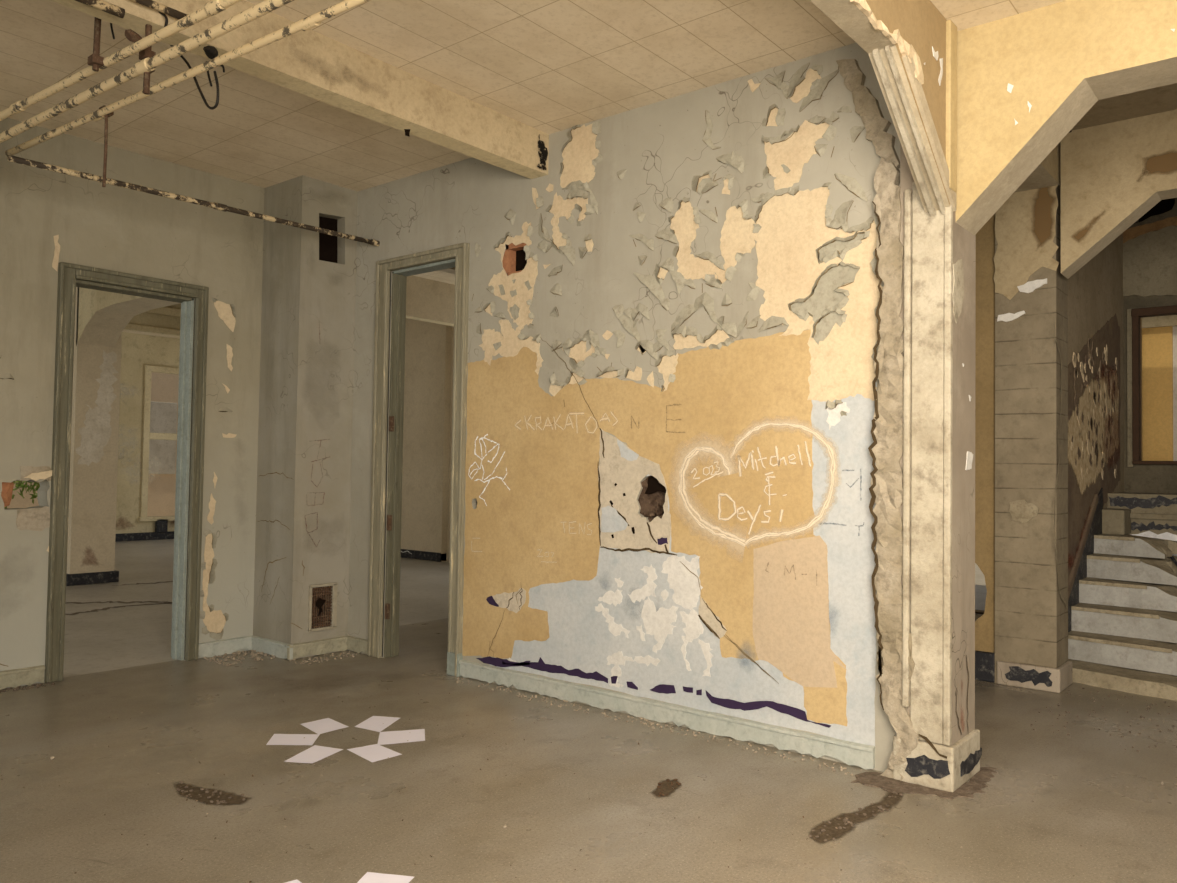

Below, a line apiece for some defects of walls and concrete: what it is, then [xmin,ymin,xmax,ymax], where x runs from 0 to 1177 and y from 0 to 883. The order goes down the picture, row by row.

spalling [850,0,943,86]
peeling [532,121,603,255]
peeling [212,298,237,371]
peeling [479,222,734,396]
spalling [654,59,982,781]
peeling [1068,338,1119,494]
flaking render [595,428,727,688]